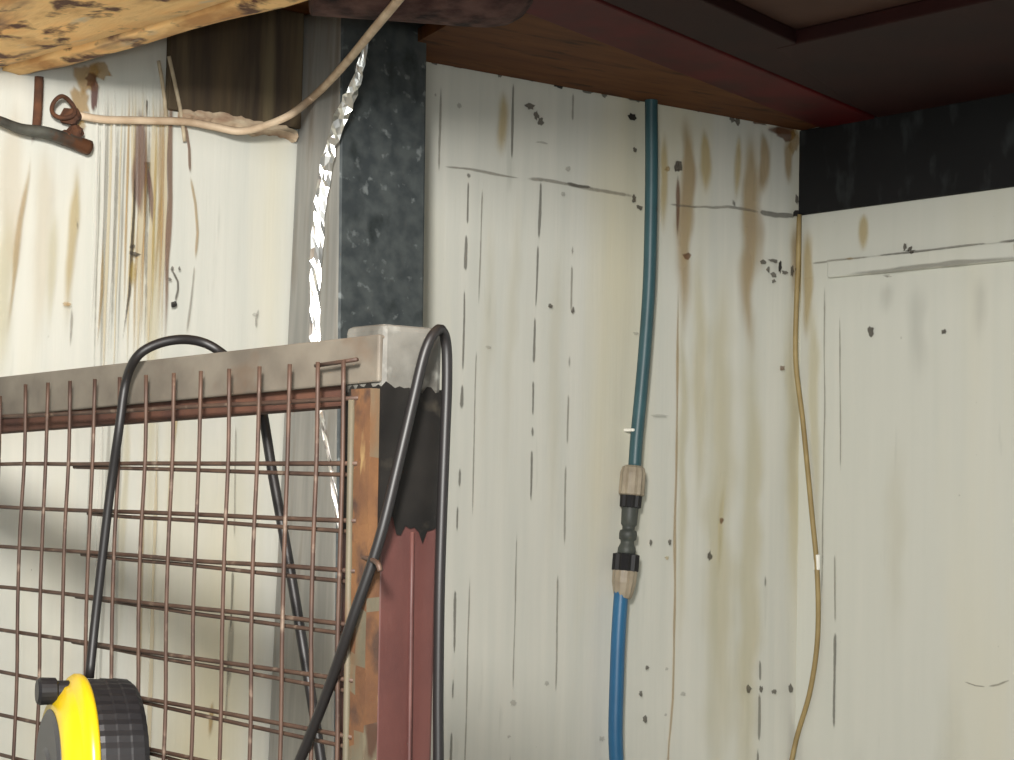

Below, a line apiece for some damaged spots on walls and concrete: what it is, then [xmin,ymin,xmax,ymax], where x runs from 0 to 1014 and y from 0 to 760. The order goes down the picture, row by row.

corrosion [71,63,111,112]
corrosion [770,127,795,141]
corrosion [125,110,172,332]